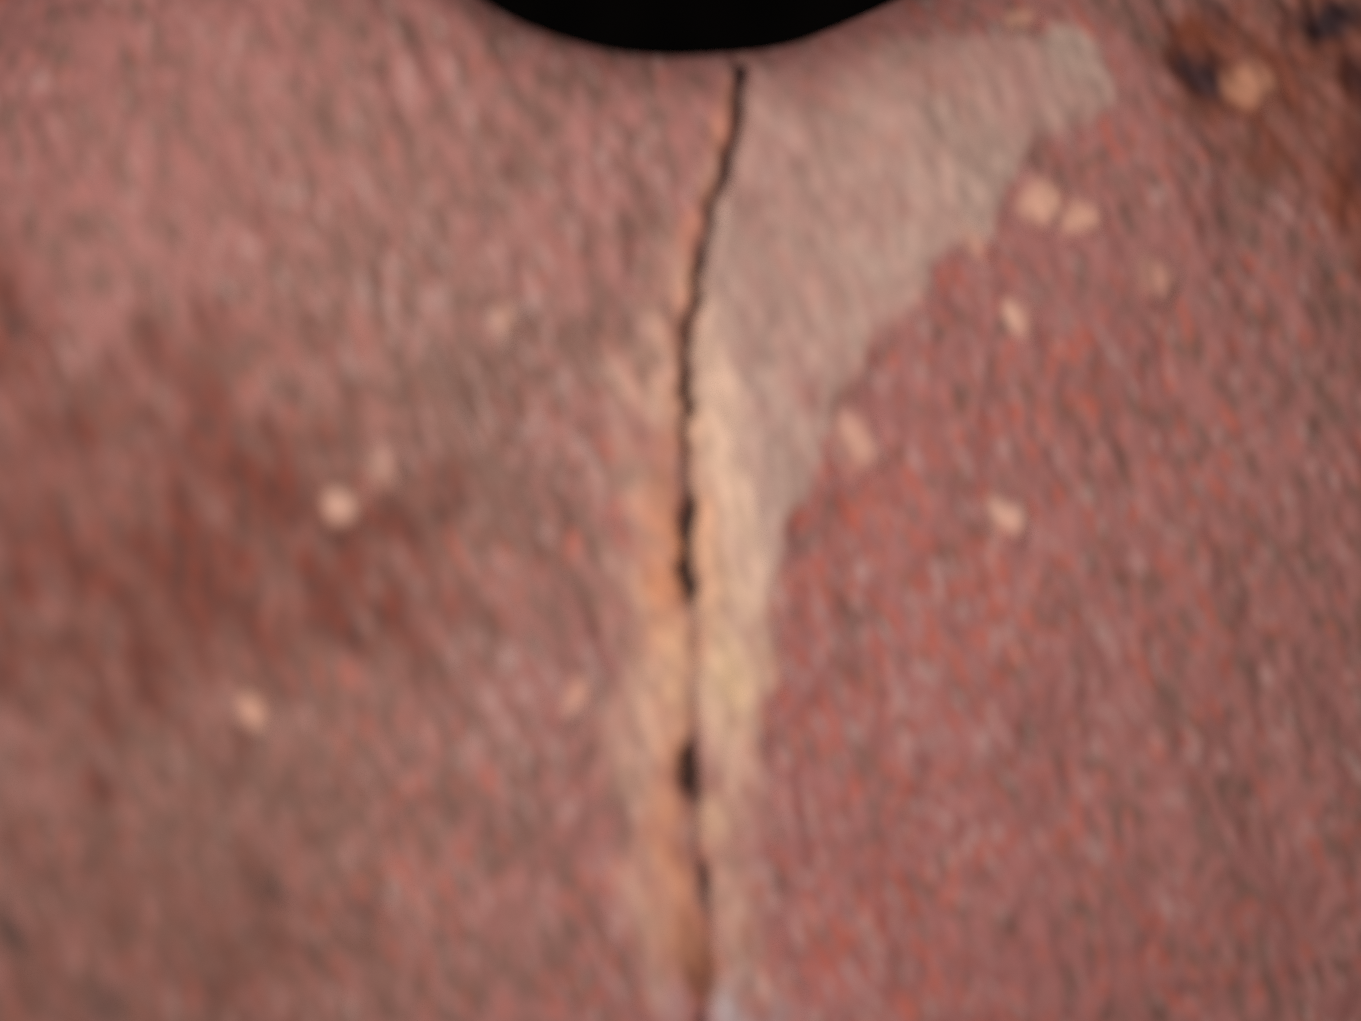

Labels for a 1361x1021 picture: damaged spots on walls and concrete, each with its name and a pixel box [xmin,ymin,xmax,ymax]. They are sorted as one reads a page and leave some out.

peeling [955,219,994,264]
peeling [1007,172,1105,242]
peeling [997,295,1037,342]
peeling [821,400,885,483]
rust [623,69,786,1005]
crack [675,63,751,1021]
peeling [979,492,1034,541]